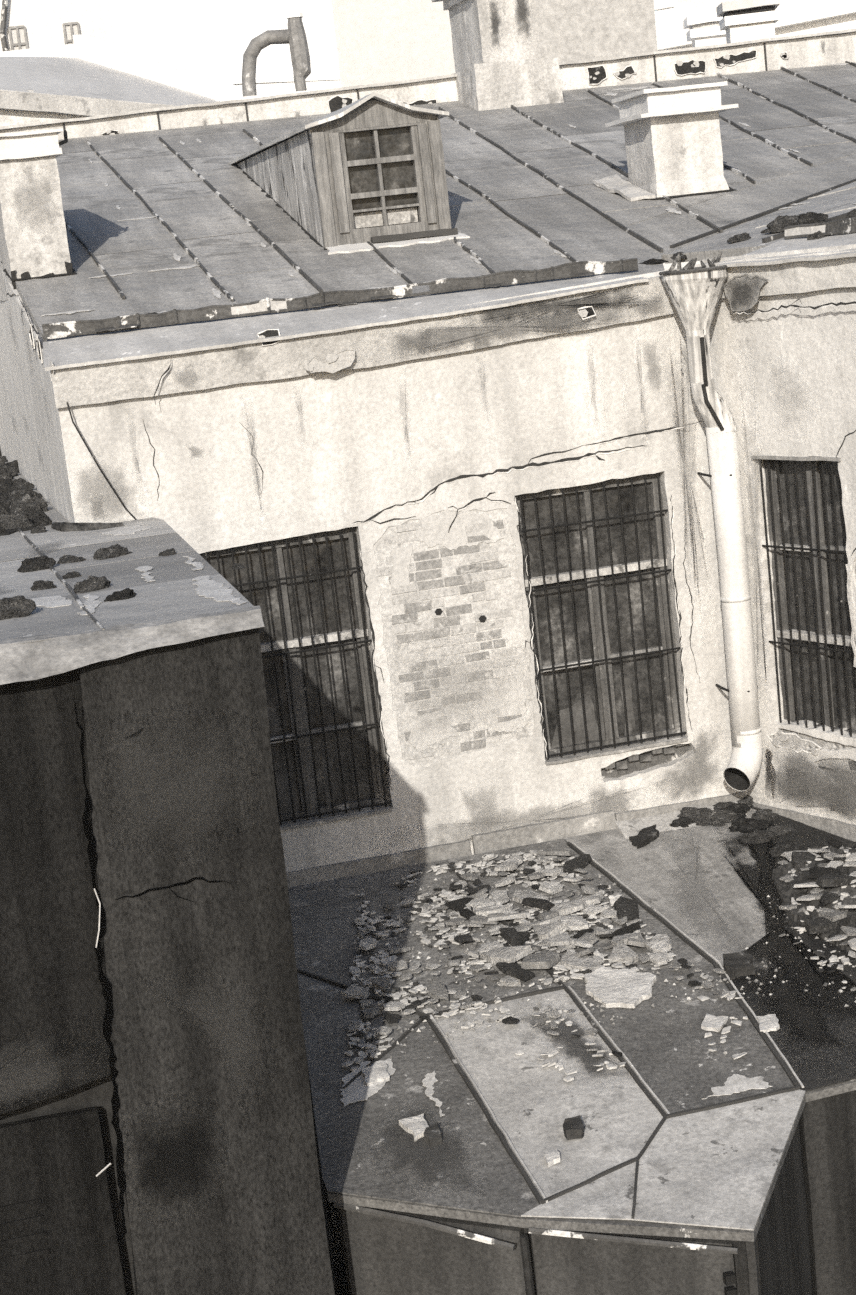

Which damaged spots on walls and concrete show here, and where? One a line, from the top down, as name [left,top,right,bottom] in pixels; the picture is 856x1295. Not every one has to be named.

crack [733,299,856,314]
crack [143,360,172,500]
crack [240,423,263,493]
flaking render [373,508,535,769]
crack [353,421,702,789]
peeling [845,561,856,667]